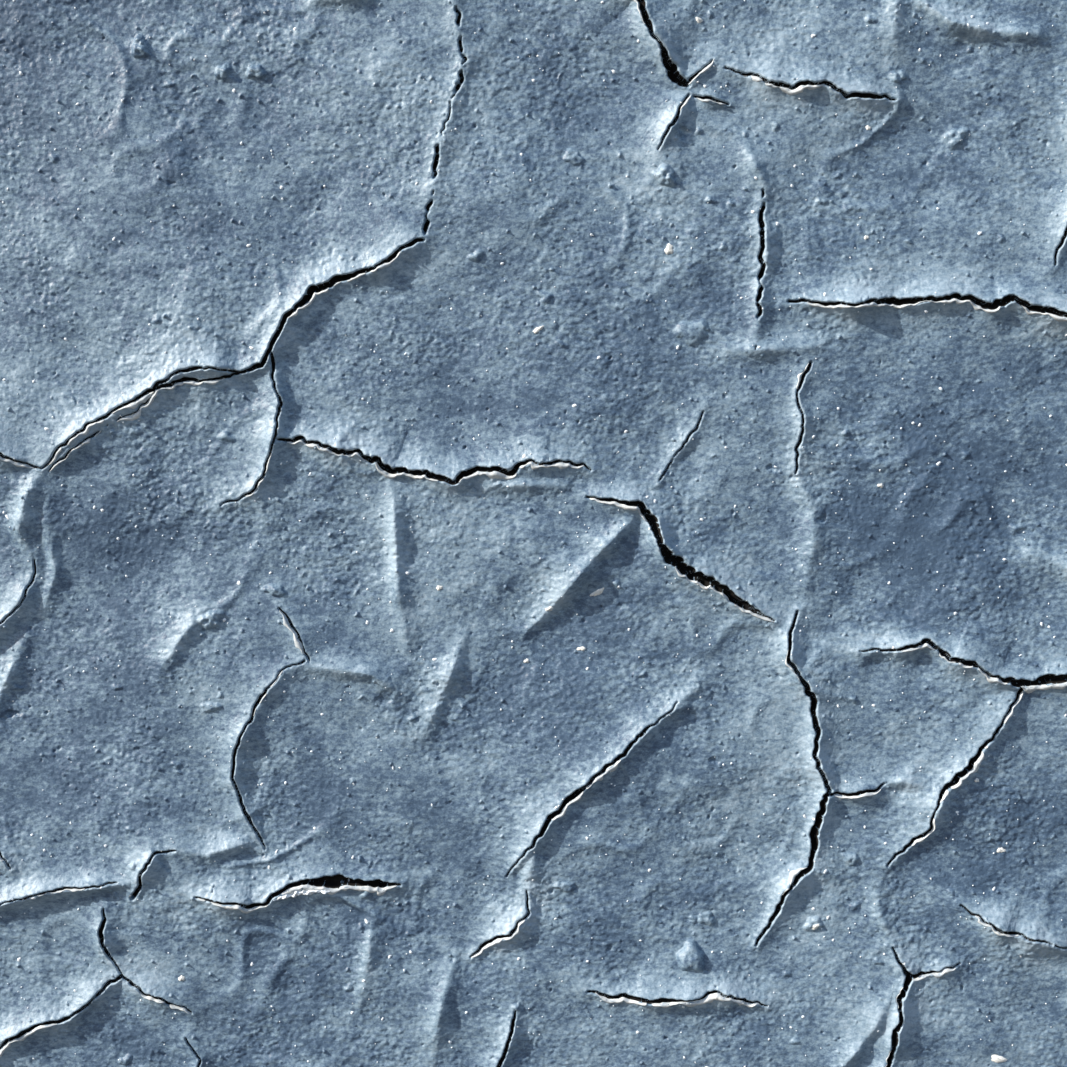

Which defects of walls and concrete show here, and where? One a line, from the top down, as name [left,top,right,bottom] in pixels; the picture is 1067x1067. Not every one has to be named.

crack [1058,103,1067,156]
crack [747,185,1067,349]
crack [0,0,904,960]
crack [849,630,1067,870]
crack [0,838,213,1067]